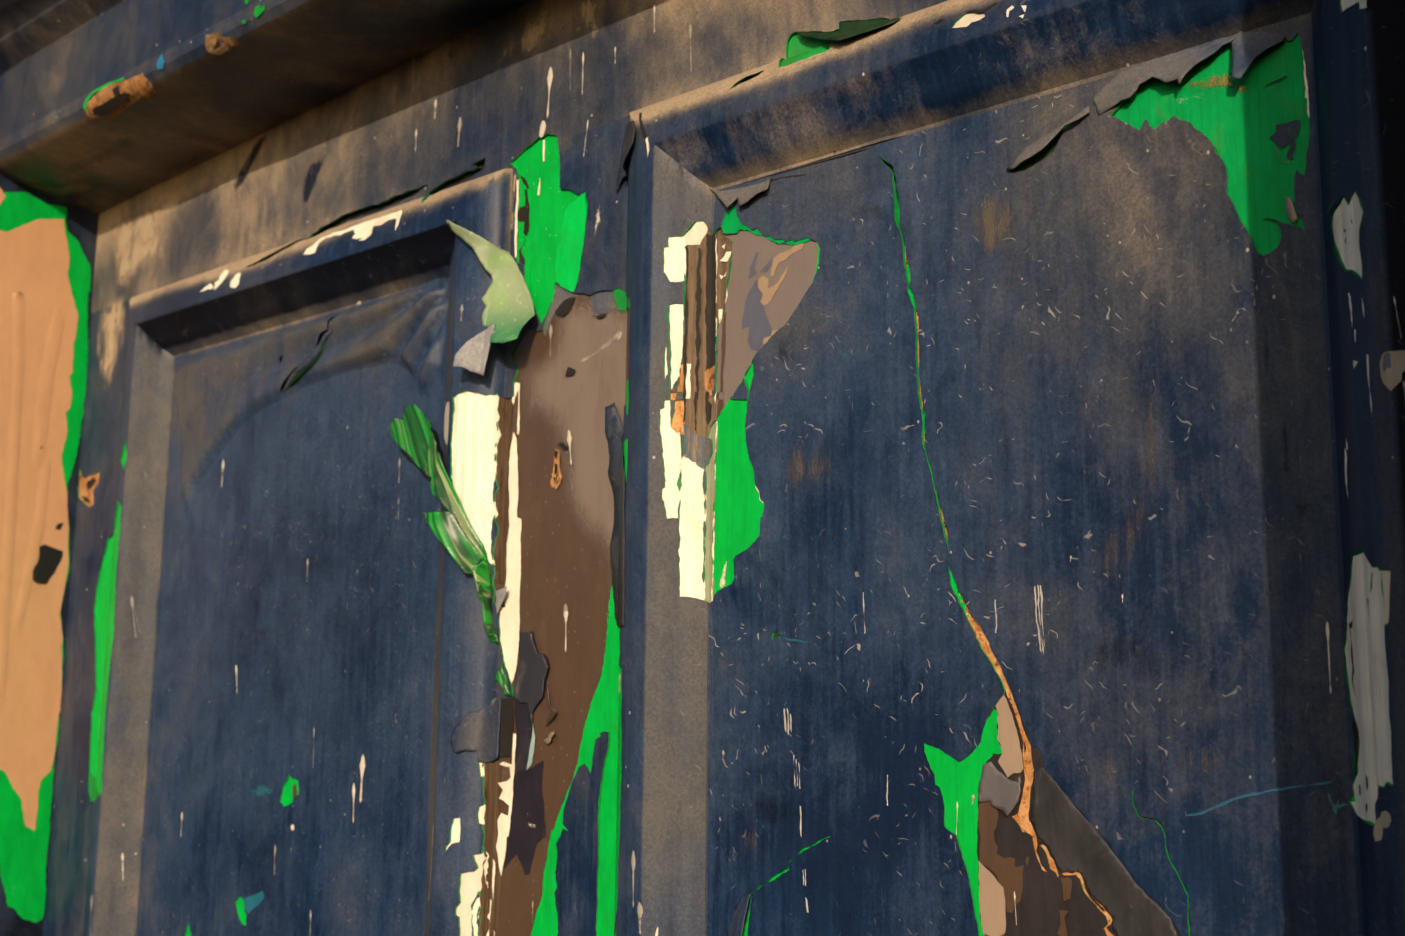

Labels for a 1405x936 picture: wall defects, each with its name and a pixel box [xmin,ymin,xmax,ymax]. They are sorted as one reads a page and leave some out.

spalling [83,55,165,118]
peeling [781,18,901,67]
peeling [1092,31,1310,256]
peeling [1327,191,1364,280]
peeling [660,174,820,603]
peeling [0,188,100,923]
peeling [90,503,121,801]
peeling [390,134,631,936]
crack [884,160,1114,936]
peeling [924,690,1181,936]
peeling [1343,551,1393,825]